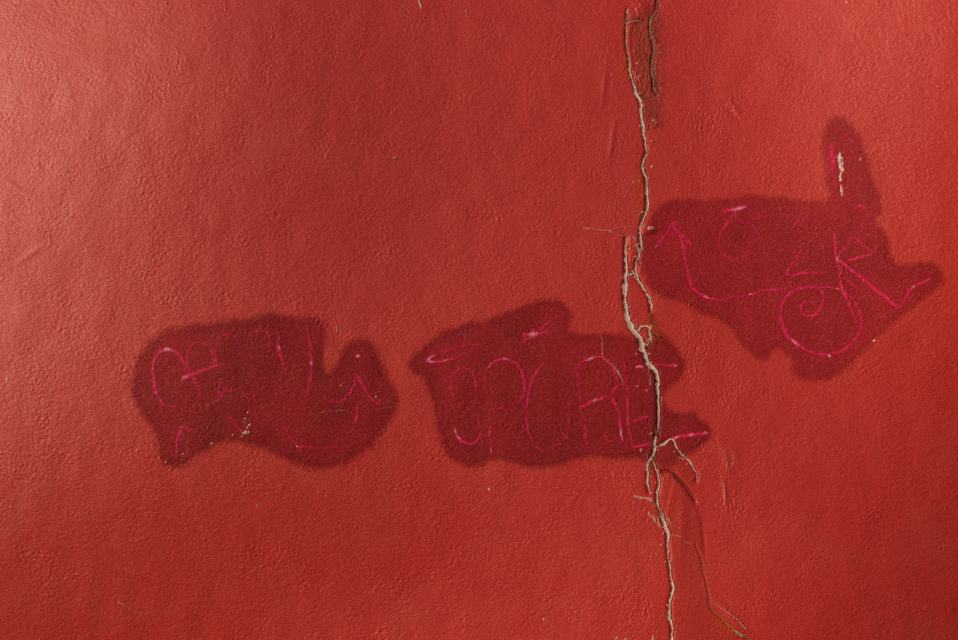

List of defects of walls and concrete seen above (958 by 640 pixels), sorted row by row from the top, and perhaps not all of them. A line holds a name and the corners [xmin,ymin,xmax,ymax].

crack [578,0,733,640]
crack [703,569,749,640]